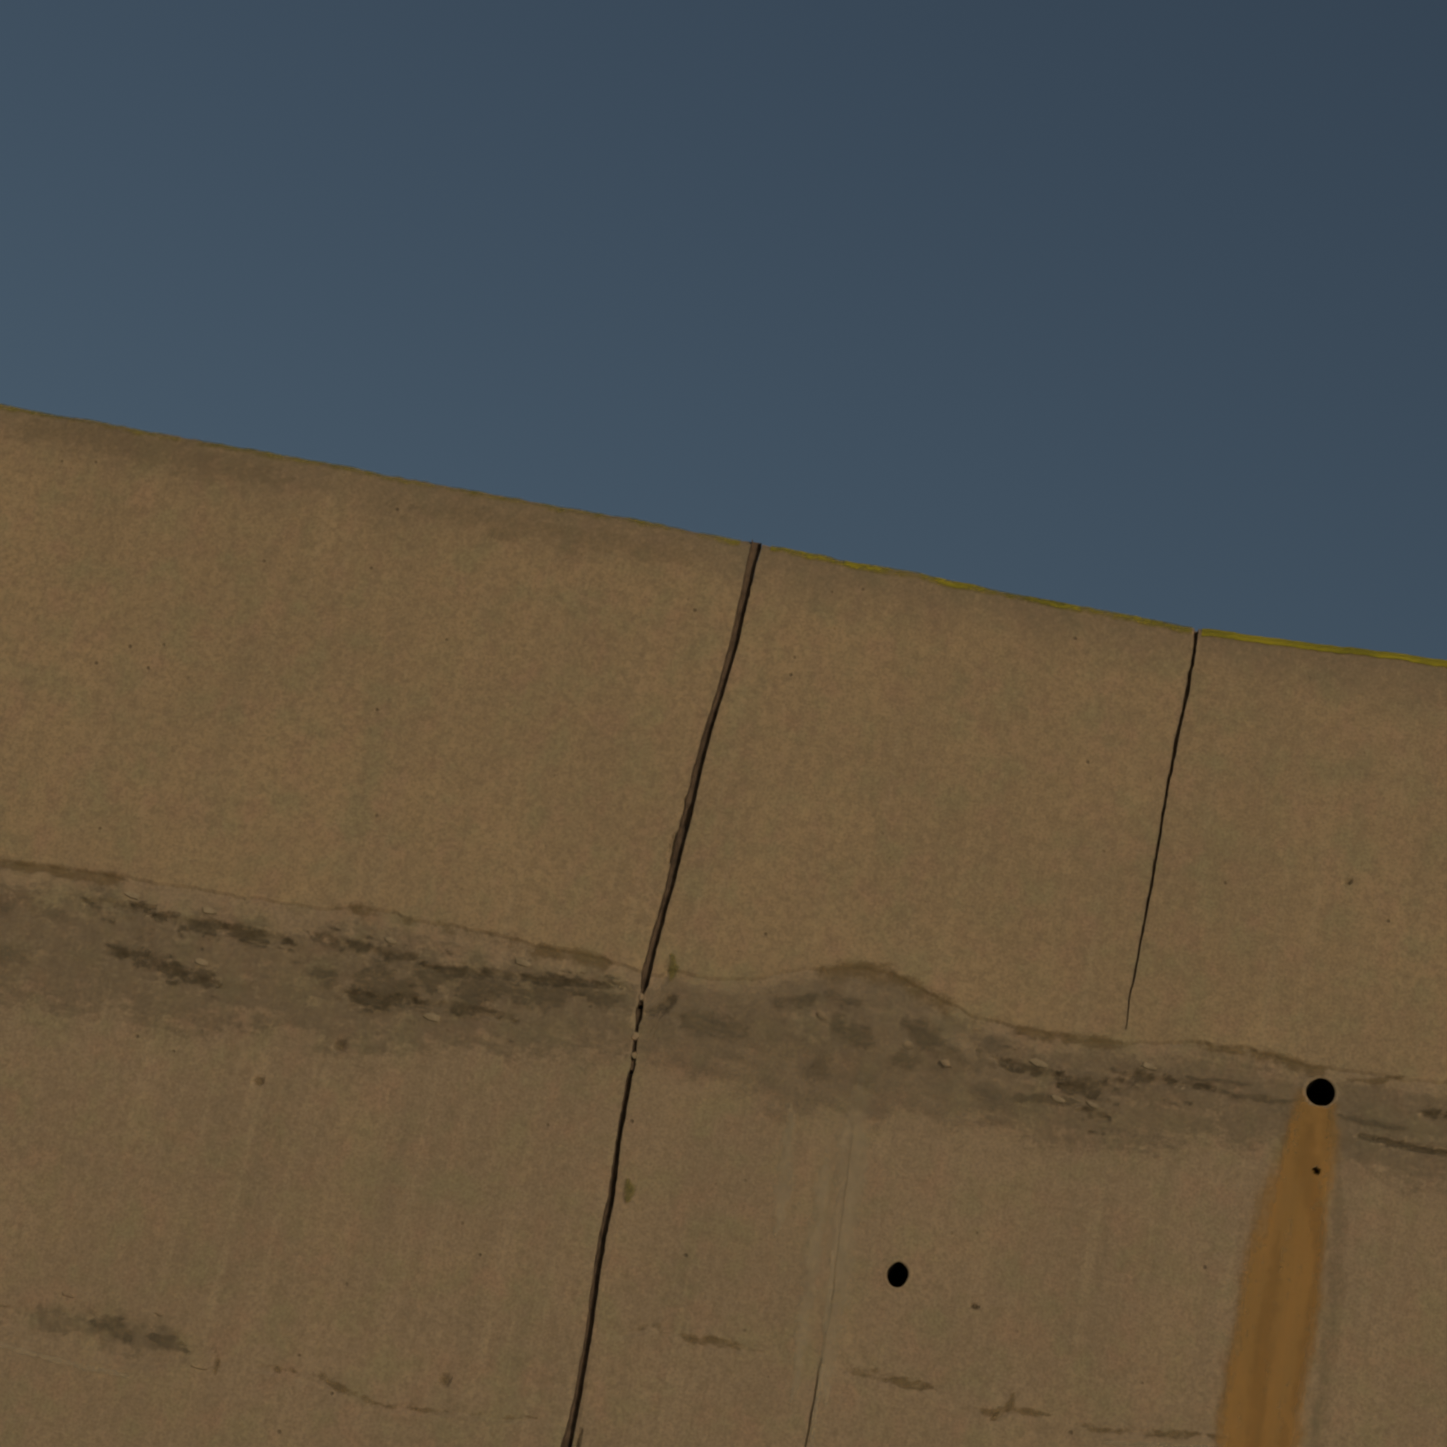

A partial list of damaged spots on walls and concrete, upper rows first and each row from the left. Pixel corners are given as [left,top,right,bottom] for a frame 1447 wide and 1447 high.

crack [561,540,762,1447]
crack [1125,631,1199,1029]
corrosion [1220,1098,1334,1447]